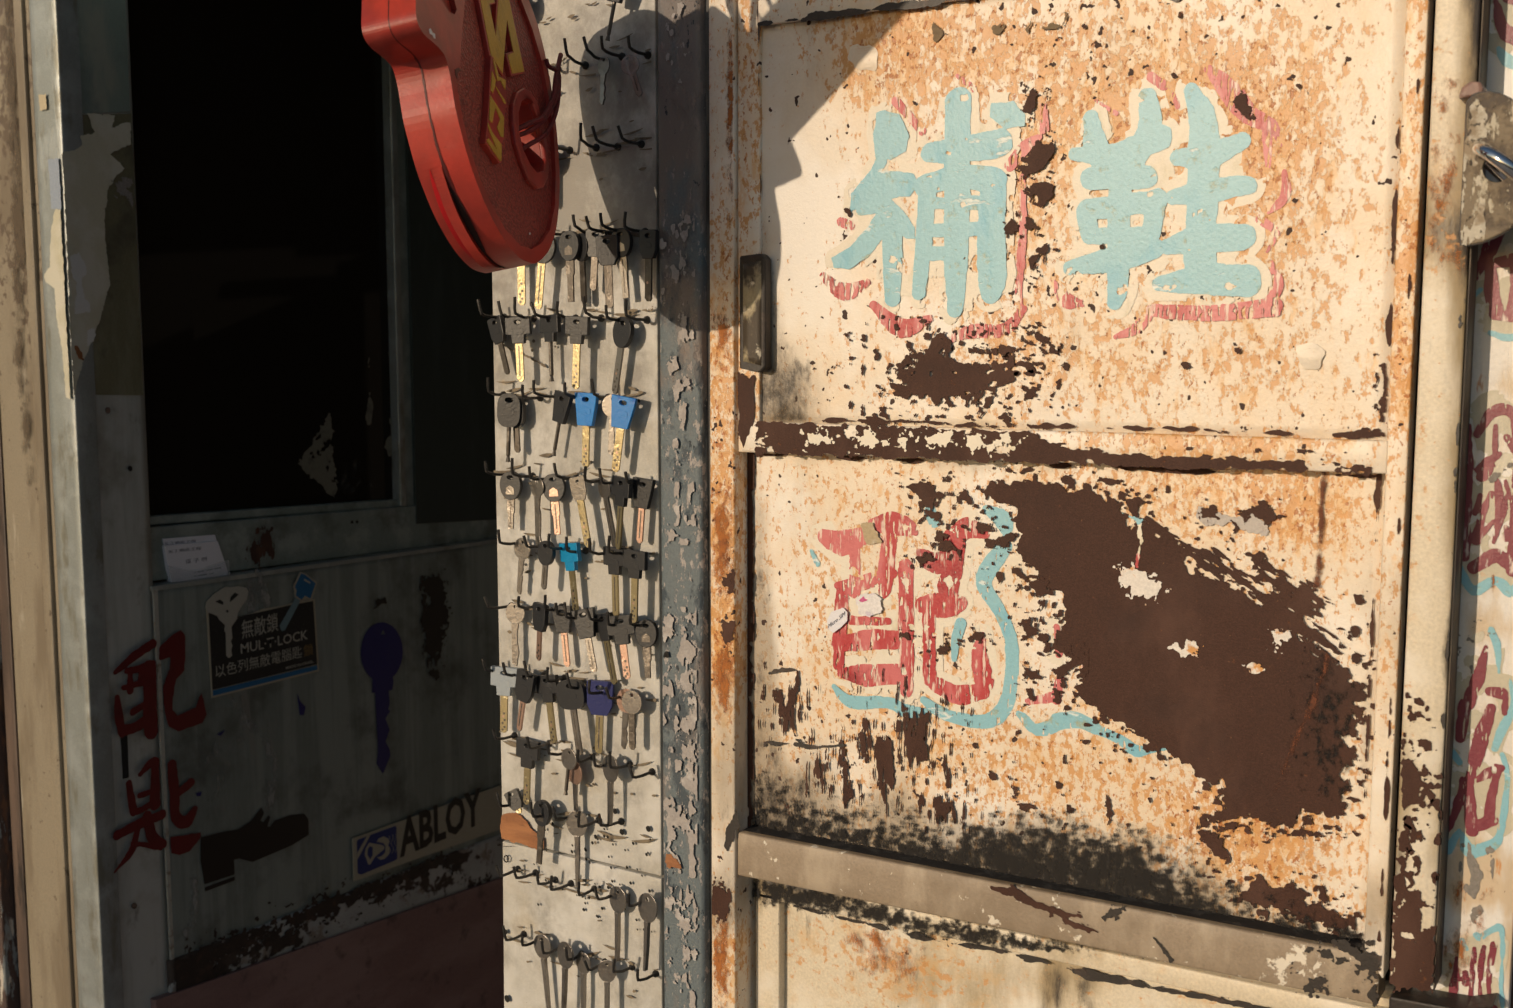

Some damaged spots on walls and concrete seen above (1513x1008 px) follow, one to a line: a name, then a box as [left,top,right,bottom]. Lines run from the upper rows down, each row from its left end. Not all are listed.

peeling [646,215,695,299]
peeling [660,302,696,545]
rust [713,491,735,597]
rust [1116,465,1216,475]
rust [1313,471,1382,588]
peeling [662,606,698,1008]
rust [713,621,735,712]
peeling [737,315,1443,1008]
rust [1363,599,1374,798]
rust [1383,698,1391,821]
peeling [1445,619,1495,674]
rust [712,880,732,1008]